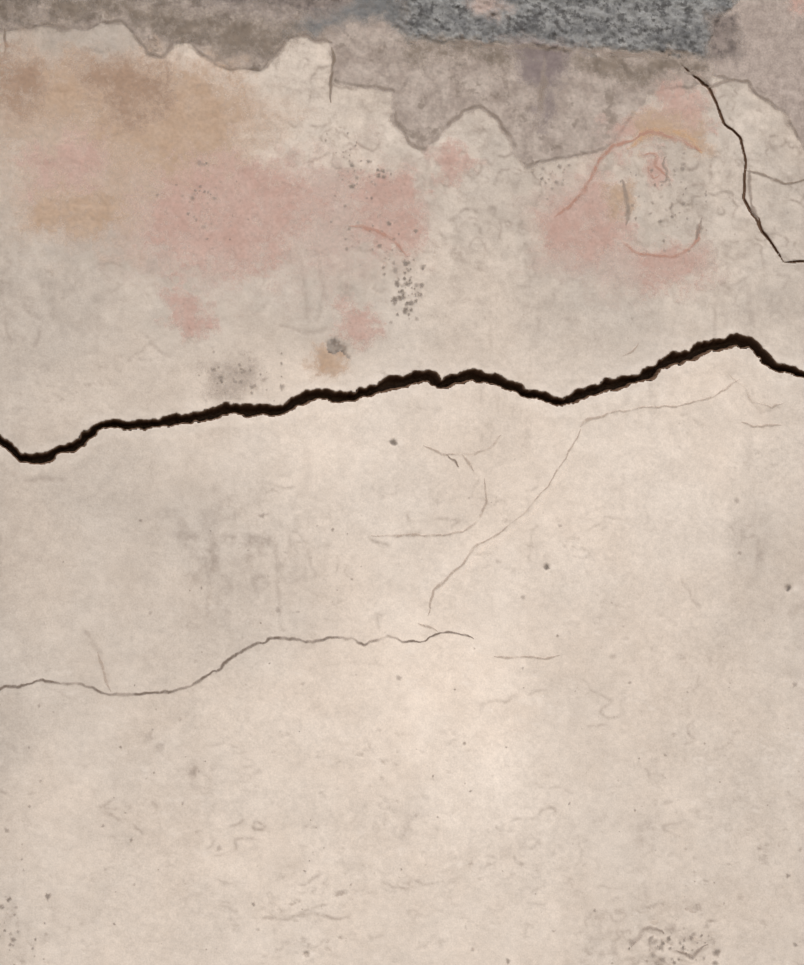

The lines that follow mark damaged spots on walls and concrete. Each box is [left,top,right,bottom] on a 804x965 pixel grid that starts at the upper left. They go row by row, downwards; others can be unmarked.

peeling [0,0,804,217]
crack [684,67,804,263]
crack [0,333,804,498]
crack [426,446,487,512]
crack [0,679,58,690]
crack [82,528,505,695]